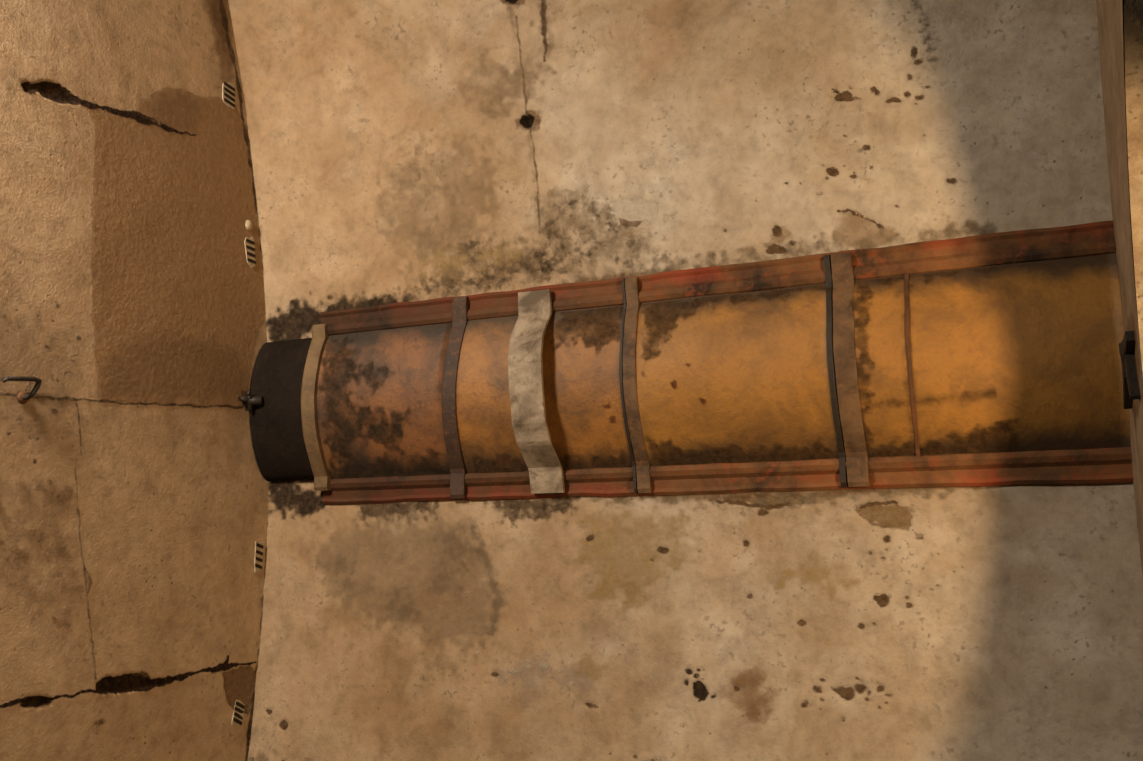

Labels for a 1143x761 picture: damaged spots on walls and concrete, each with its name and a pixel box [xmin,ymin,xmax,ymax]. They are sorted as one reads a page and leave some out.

crack [21,81,195,136]
crack [515,0,548,218]
water stain [88,87,410,407]
water stain [426,202,634,295]
crack [0,509,267,761]